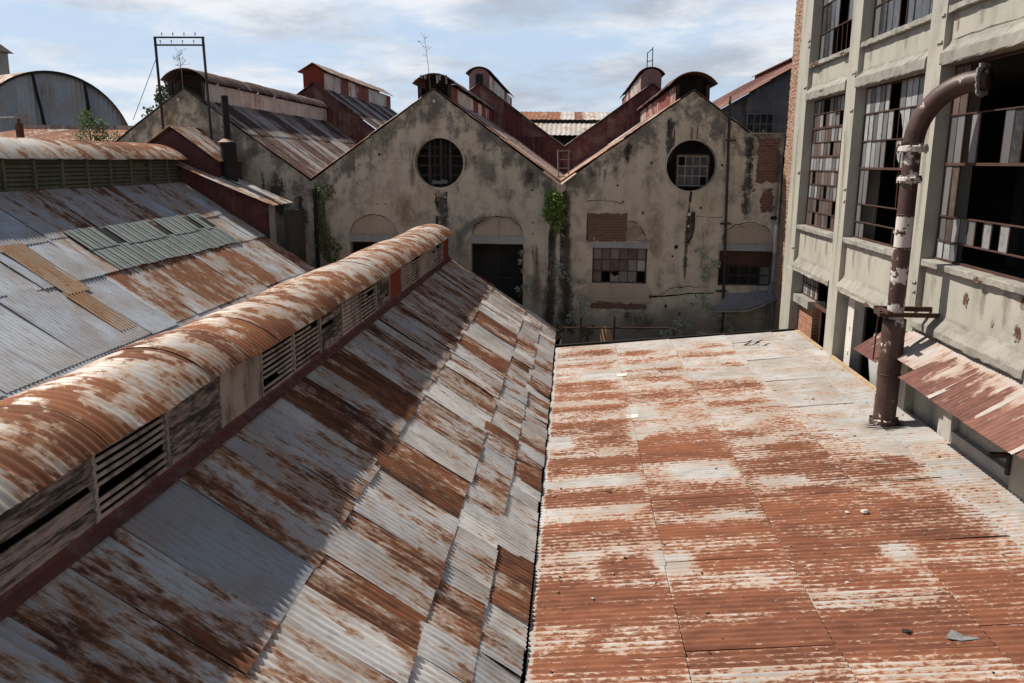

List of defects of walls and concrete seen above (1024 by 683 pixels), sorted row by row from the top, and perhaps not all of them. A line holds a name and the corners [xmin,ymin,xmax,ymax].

rust [0,243,136,331]
water stain [435,191,449,226]
water stain [543,192,574,325]
flaking render [585,200,628,244]
water stain [666,119,675,163]
crack [649,284,714,299]
water stain [741,137,754,219]
spalling [751,0,818,330]